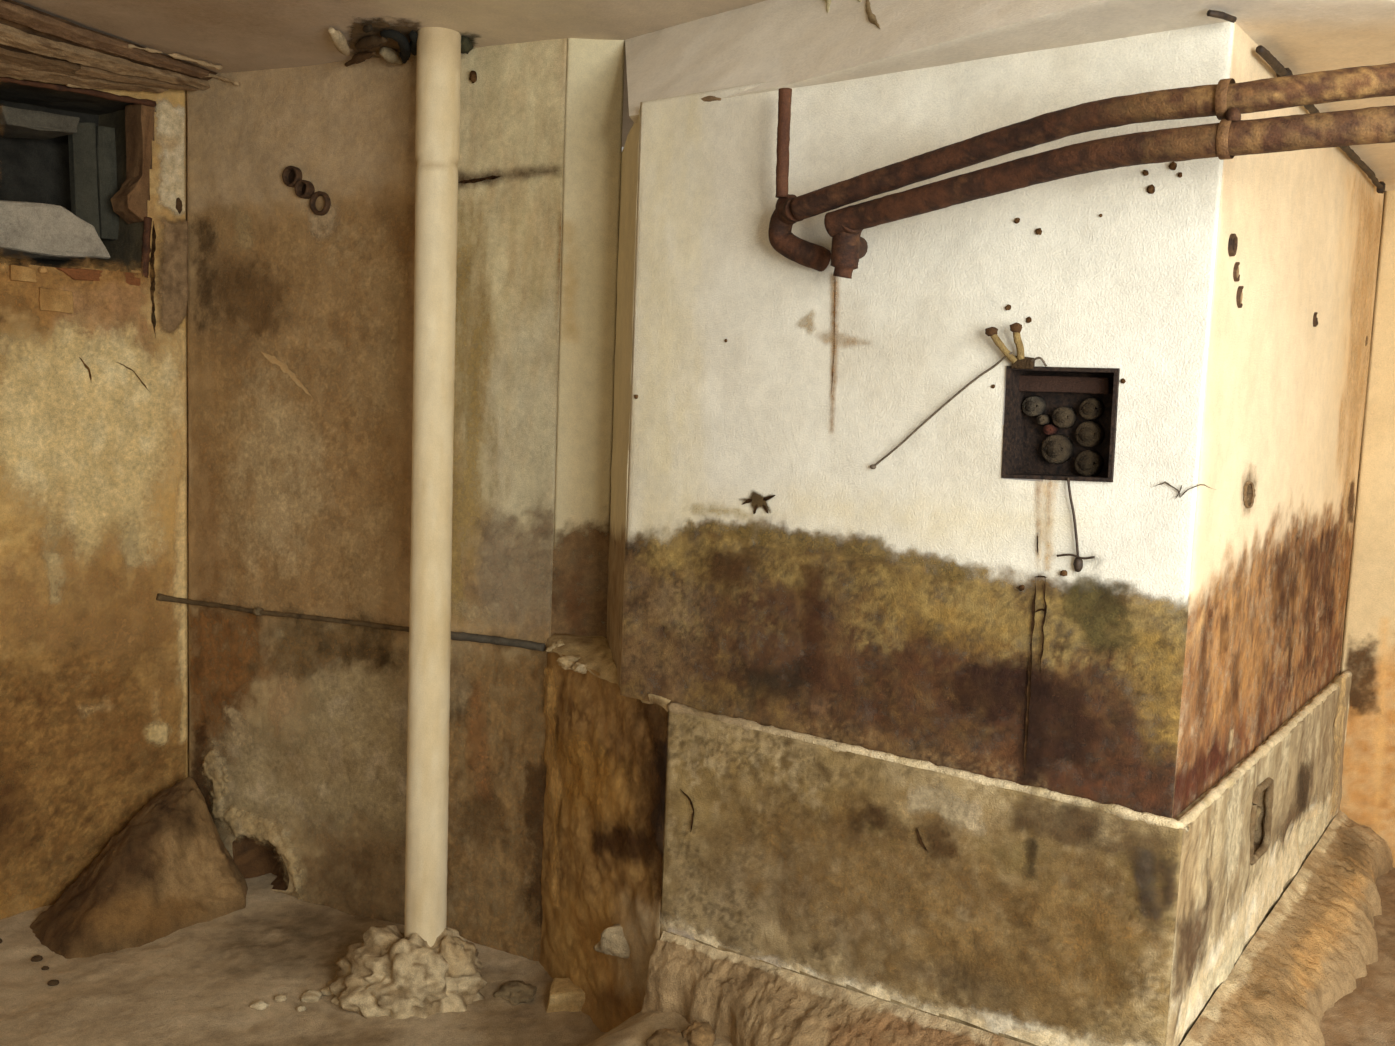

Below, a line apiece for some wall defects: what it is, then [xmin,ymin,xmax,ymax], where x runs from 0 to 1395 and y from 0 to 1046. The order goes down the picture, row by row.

spalling [0,0,240,215]
corrosion [831,276,855,400]
peeling [0,263,187,741]
water stain [0,201,415,925]
water stain [446,206,1381,1046]
spalling [206,641,408,893]
peeling [544,668,610,907]